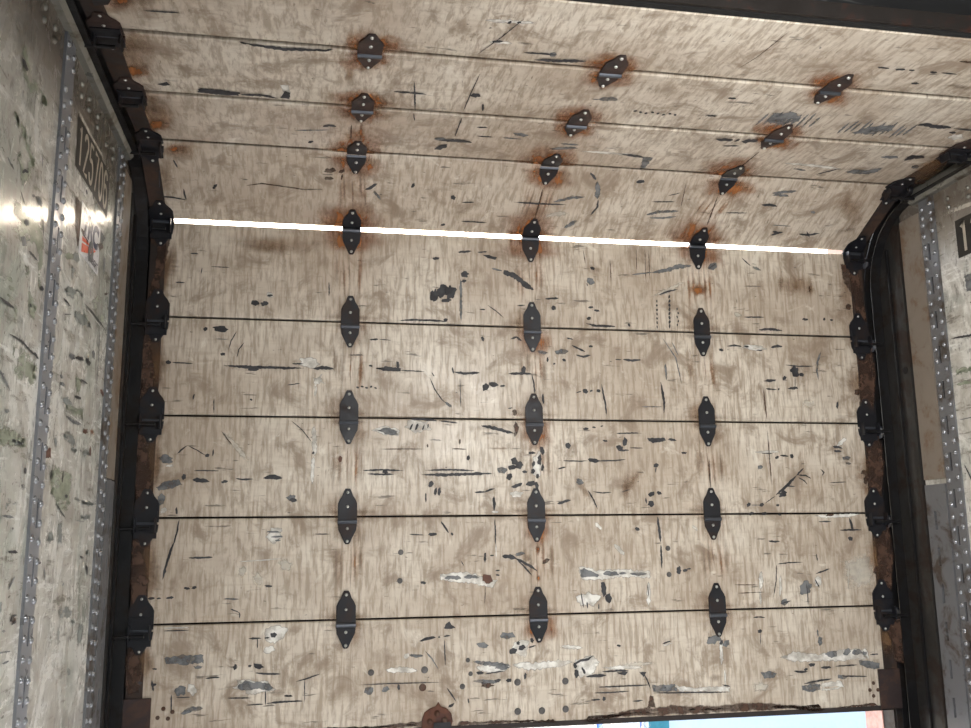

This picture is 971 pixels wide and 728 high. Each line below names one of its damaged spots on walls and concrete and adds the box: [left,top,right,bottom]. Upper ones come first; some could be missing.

corrosion [334,92,383,172]
corrosion [325,208,371,249]
corrosion [511,151,572,257]
corrosion [674,124,797,263]
corrosion [855,348,876,407]
corrosion [861,435,884,496]
corrosion [130,539,149,605]
corrosion [873,525,893,590]
corrosion [125,647,144,694]